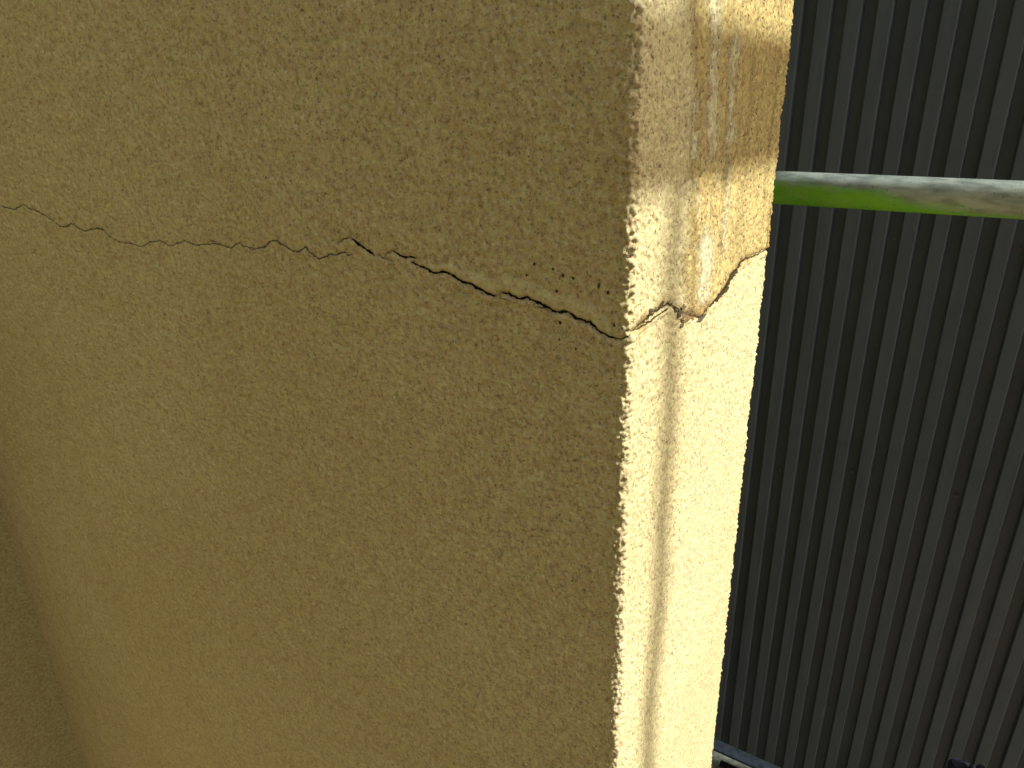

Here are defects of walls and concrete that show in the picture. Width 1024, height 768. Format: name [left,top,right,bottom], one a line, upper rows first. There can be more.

crack [0,204,766,340]